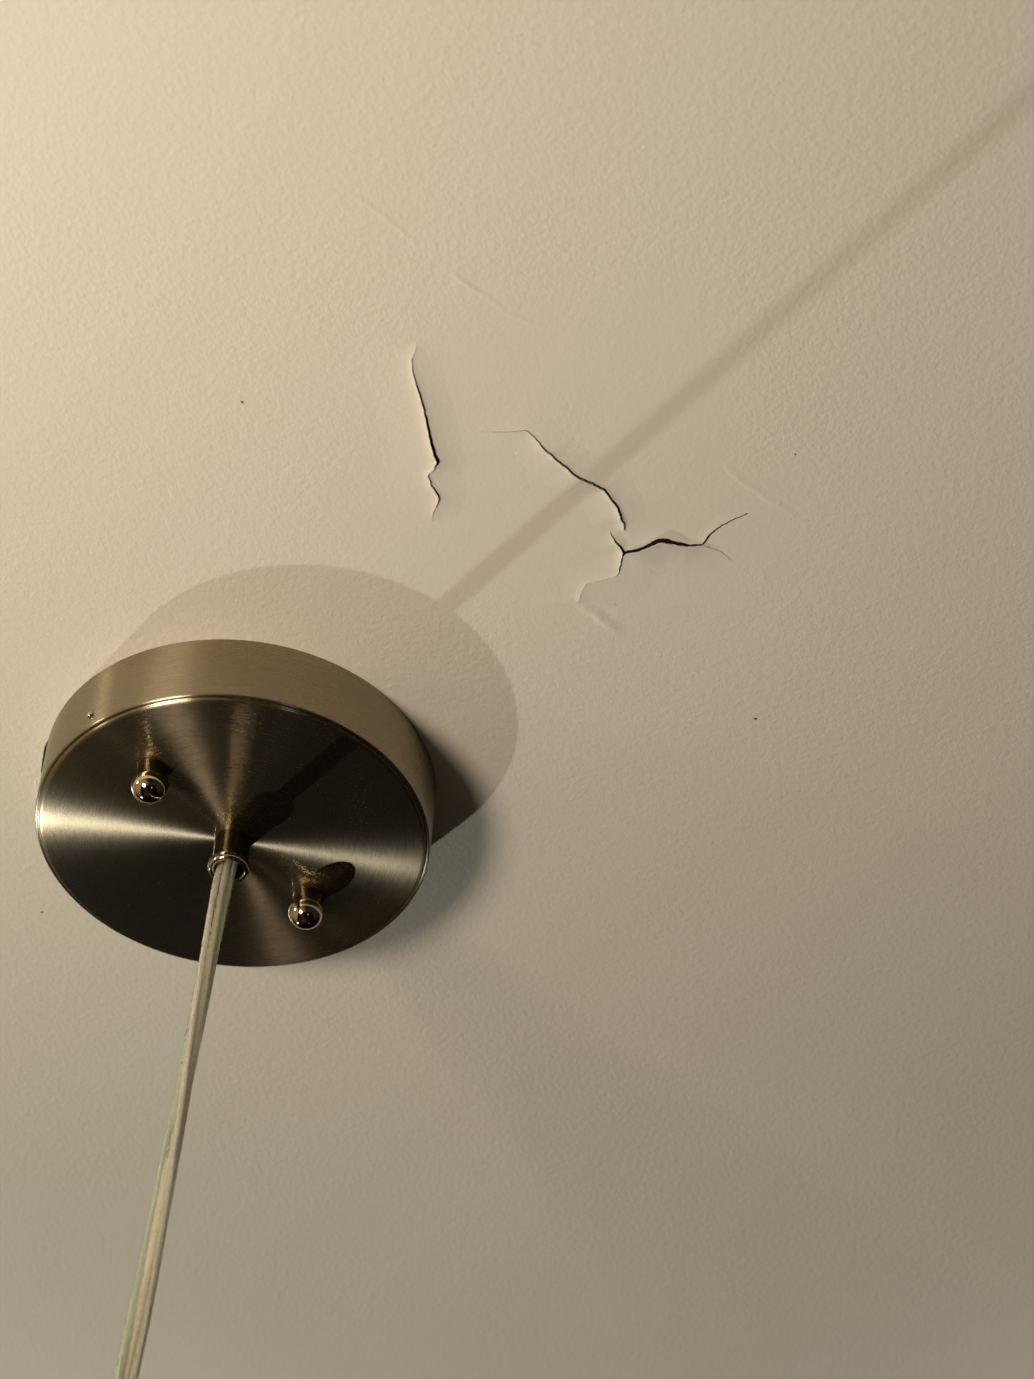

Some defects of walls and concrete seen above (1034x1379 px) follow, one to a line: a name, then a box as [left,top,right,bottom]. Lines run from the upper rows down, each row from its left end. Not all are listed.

crack [362,334,748,610]